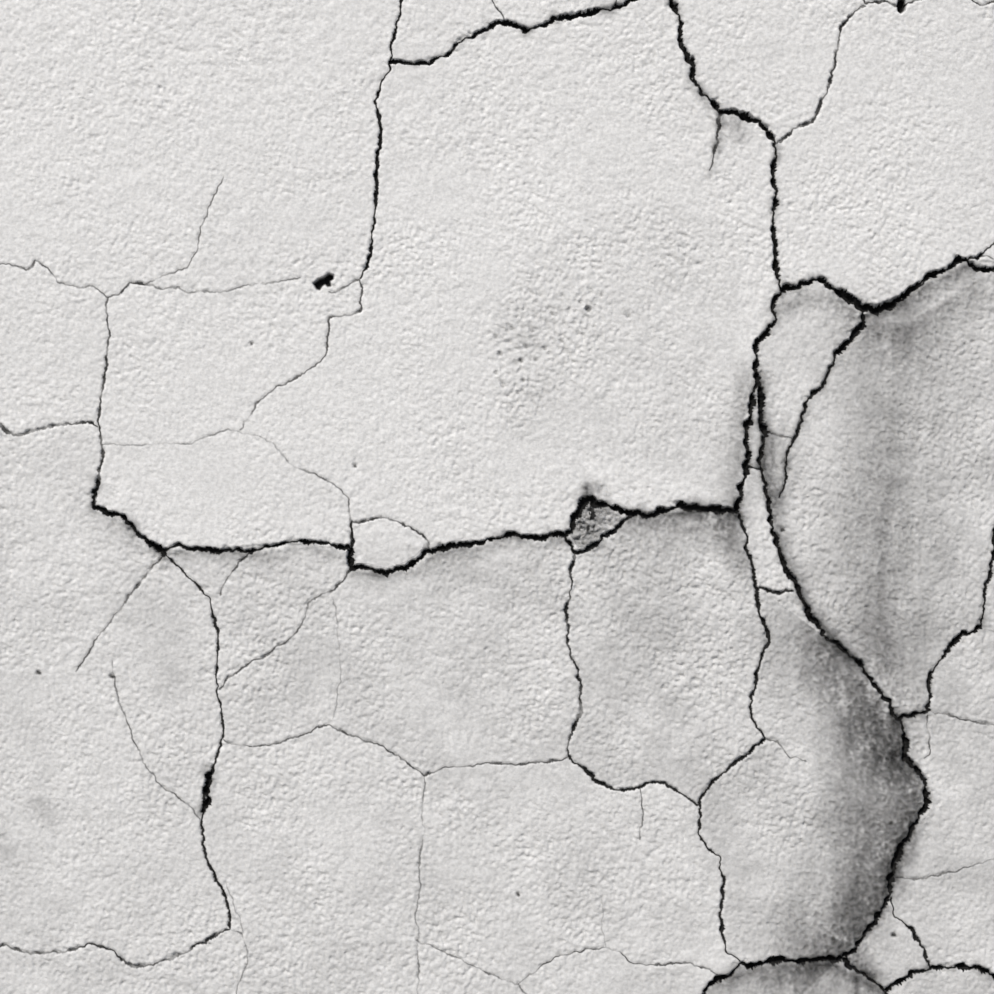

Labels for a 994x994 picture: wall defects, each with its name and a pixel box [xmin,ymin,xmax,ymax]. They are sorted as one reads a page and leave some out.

crack [174,181,222,273]
crack [210,0,637,436]
crack [96,281,165,306]
crack [100,355,108,391]
crack [0,424,29,436]
crack [66,396,105,473]
crack [670,0,994,994]
spalling [571,506,617,547]
crack [91,477,794,961]
crack [35,942,180,968]
crack [621,953,705,969]